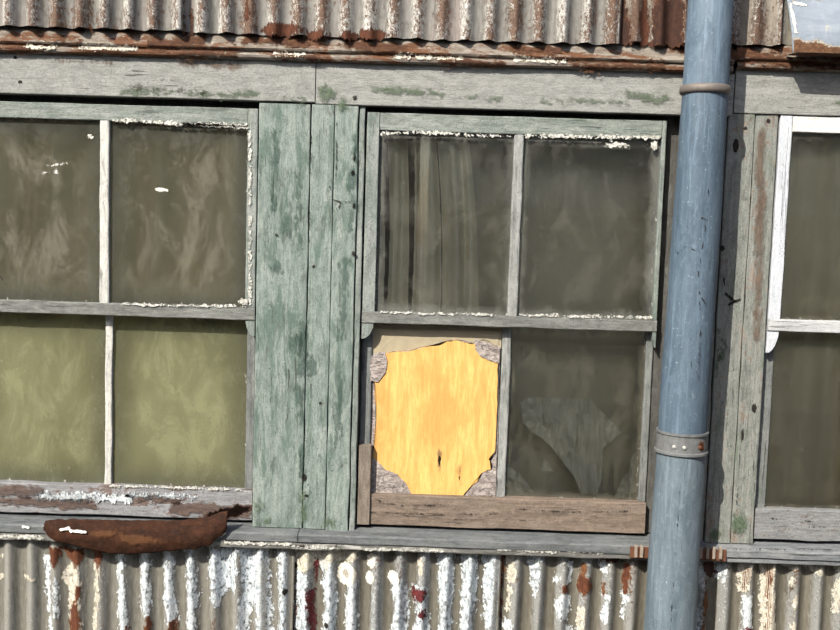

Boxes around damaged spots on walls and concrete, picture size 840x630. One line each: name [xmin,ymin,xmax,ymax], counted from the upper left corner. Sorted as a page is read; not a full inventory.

corrosion [146,0,408,62]
corrosion [620,0,688,49]
peeling [525,133,661,151]
peeling [33,484,242,505]
corrosion [43,503,253,571]
peeling [24,553,101,630]
corrosion [68,585,82,630]
peeling [115,554,130,630]
corrosion [294,559,321,630]
peeling [139,532,610,630]
corrosion [409,585,428,622]
peeling [599,590,631,625]